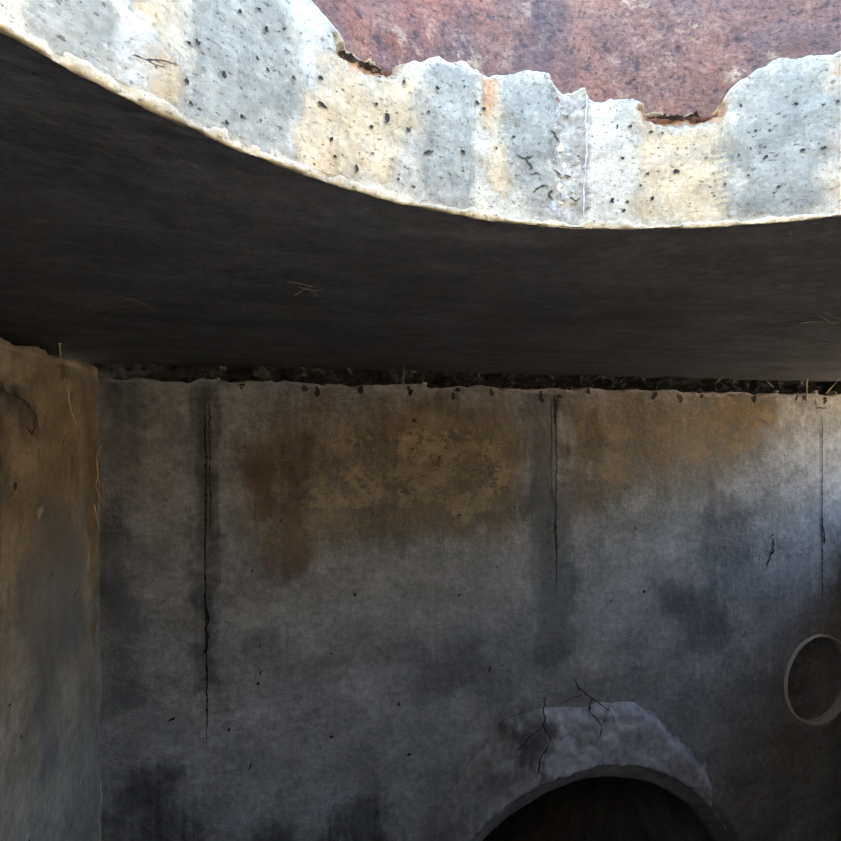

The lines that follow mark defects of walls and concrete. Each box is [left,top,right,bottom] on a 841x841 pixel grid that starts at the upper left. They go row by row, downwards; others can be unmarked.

crack [194,388,220,747]
crack [550,394,558,599]
crack [516,677,615,777]